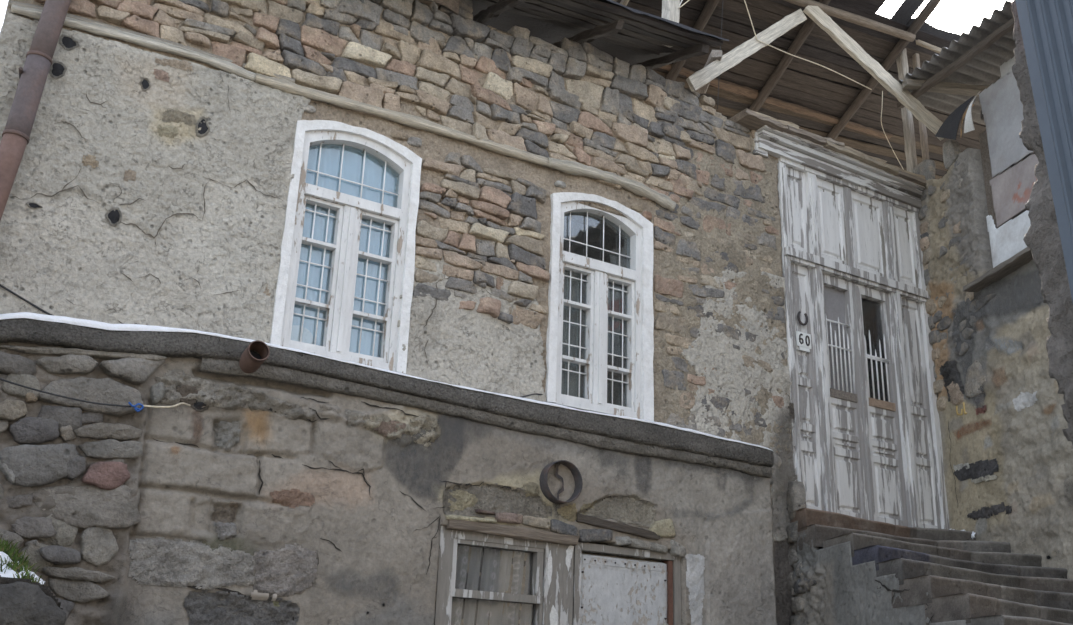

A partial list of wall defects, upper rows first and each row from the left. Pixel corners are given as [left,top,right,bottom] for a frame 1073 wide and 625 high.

crack [12,169,283,244]
spalling [939,360,965,402]
crack [247,454,371,494]
leakage [388,416,479,496]
spalling [953,458,999,484]
spalling [270,489,315,508]
crack [400,481,513,575]
spalling [967,502,1012,520]
spalling [128,501,318,625]
peeling [565,545,574,572]
peeling [685,554,705,625]
peeling [550,605,558,625]